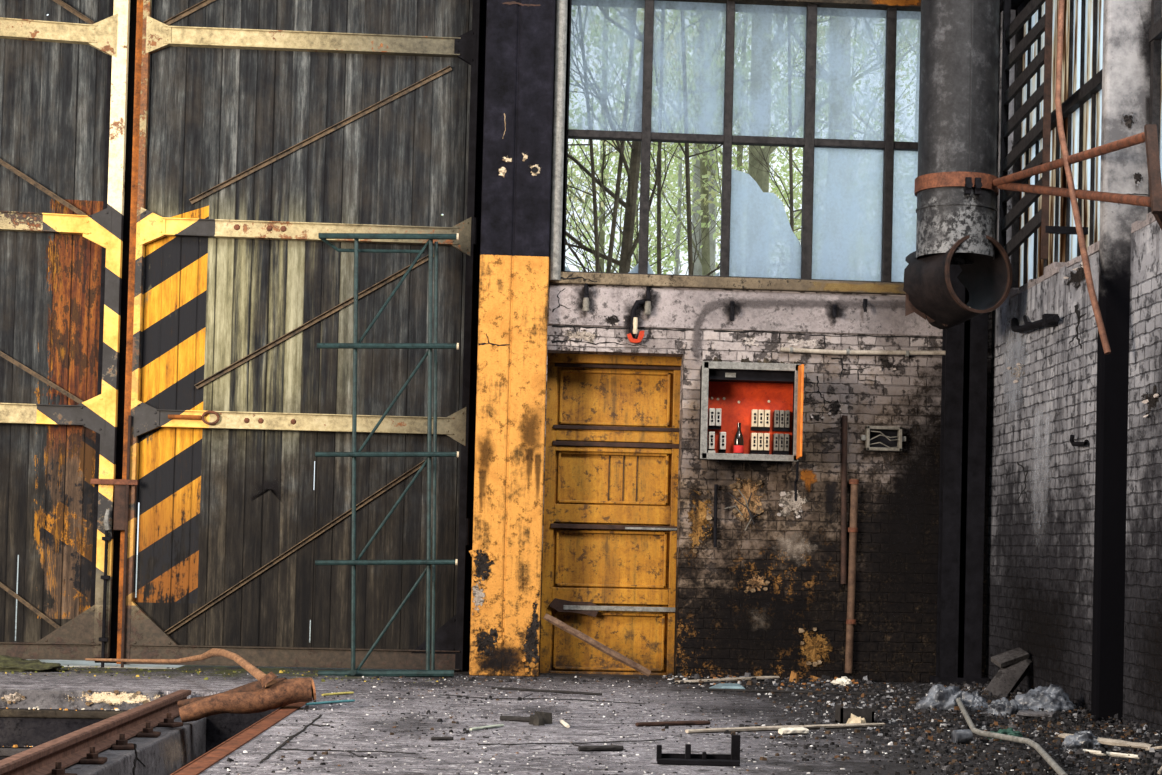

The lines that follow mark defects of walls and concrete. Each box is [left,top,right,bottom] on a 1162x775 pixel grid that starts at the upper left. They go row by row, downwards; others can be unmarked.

spalling [784,336,822,348]
spalling [879,357,898,371]
leakage [690,493,699,520]
leakage [783,539,804,553]
peeling [469,542,502,658]
peeling [521,590,540,674]